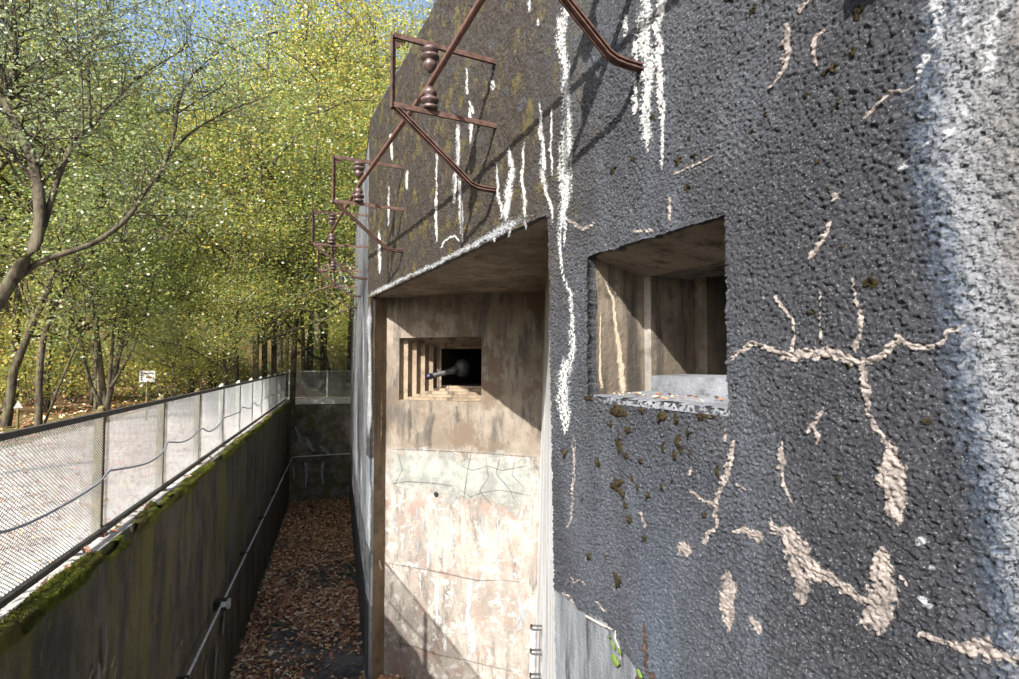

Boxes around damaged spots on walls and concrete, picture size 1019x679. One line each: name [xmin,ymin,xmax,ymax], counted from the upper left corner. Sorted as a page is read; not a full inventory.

efflorescence [621,0,667,166]
efflorescence [350,67,527,491]
efflorescence [538,7,576,435]
crack [730,275,972,528]
rust [635,623,656,679]